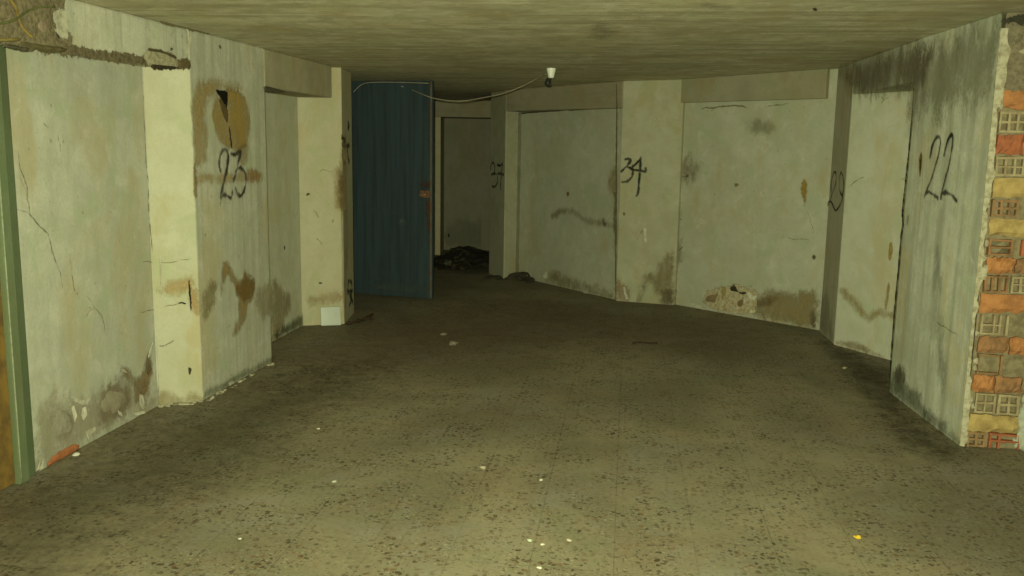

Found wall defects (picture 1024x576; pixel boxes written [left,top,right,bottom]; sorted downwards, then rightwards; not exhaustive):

spalling [0,0,191,70]
water stain [839,28,995,113]
water stain [193,82,239,164]
flaking render [959,14,1024,451]
water stain [203,262,260,333]
spalling [689,283,759,315]
water stain [757,291,817,327]
peeling [118,394,145,417]